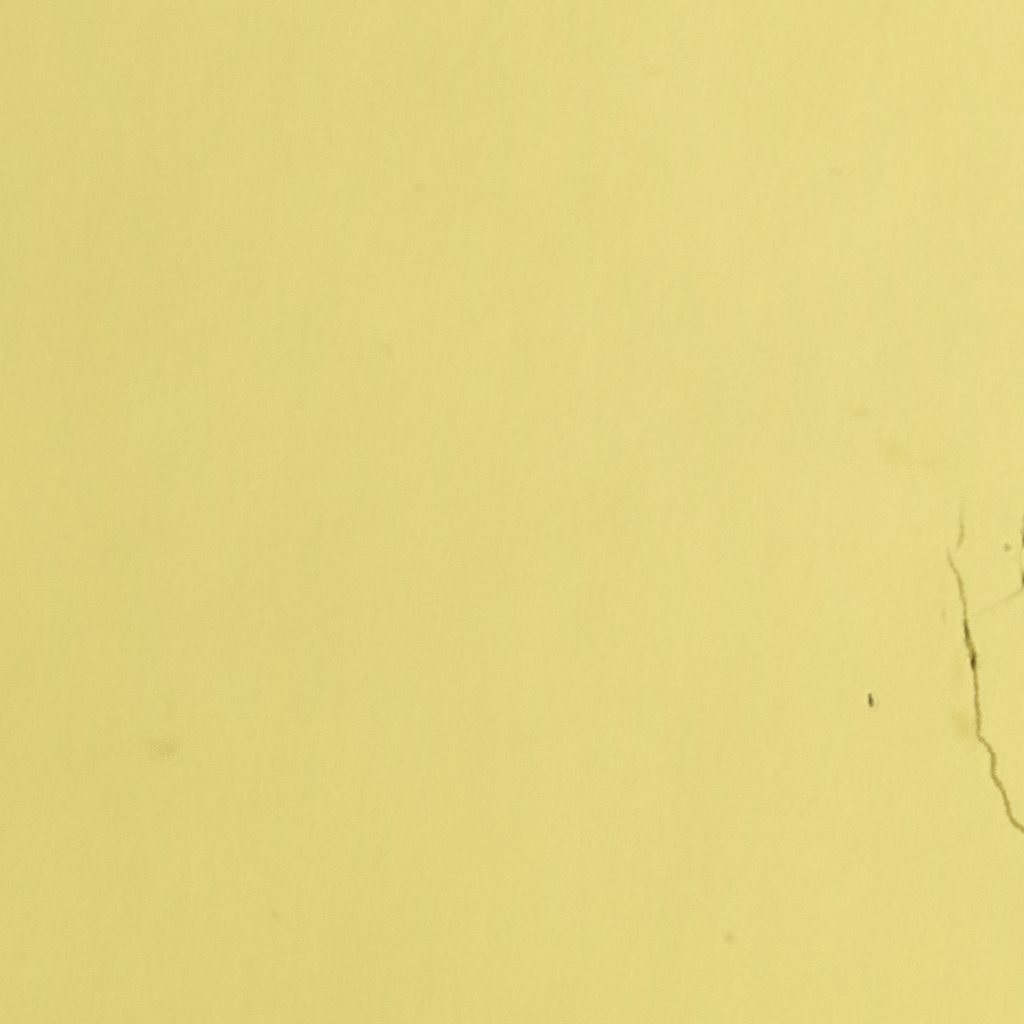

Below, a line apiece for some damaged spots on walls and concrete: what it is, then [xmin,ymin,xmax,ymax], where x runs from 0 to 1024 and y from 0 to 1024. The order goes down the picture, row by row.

crack [965,622,1024,833]